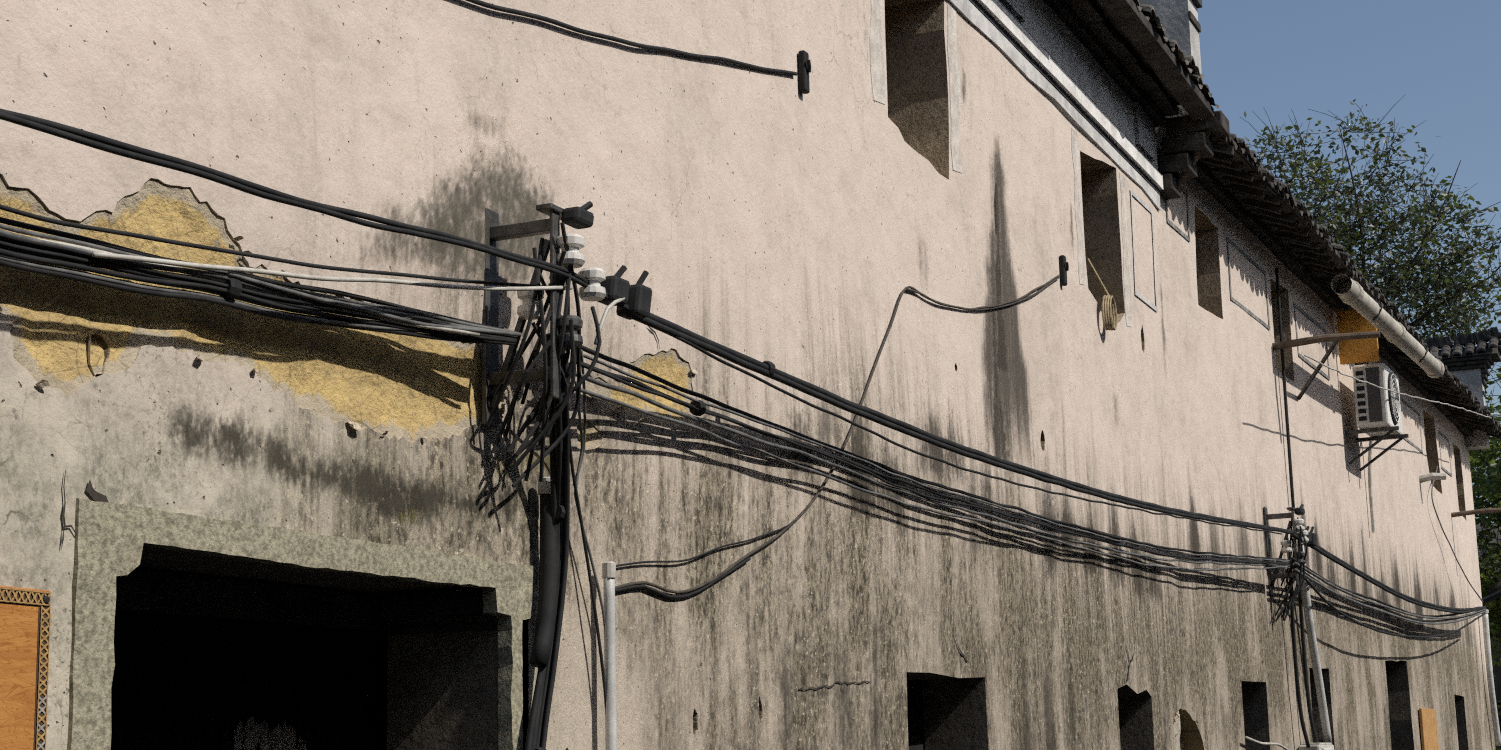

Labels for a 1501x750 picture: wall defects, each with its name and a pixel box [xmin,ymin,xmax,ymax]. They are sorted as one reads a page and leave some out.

flaking render [0,174,510,443]
flaking render [577,420,604,455]
flaking render [586,348,697,426]
damp [790,404,904,529]
damp [921,151,1030,542]
damp [1025,677,1075,750]